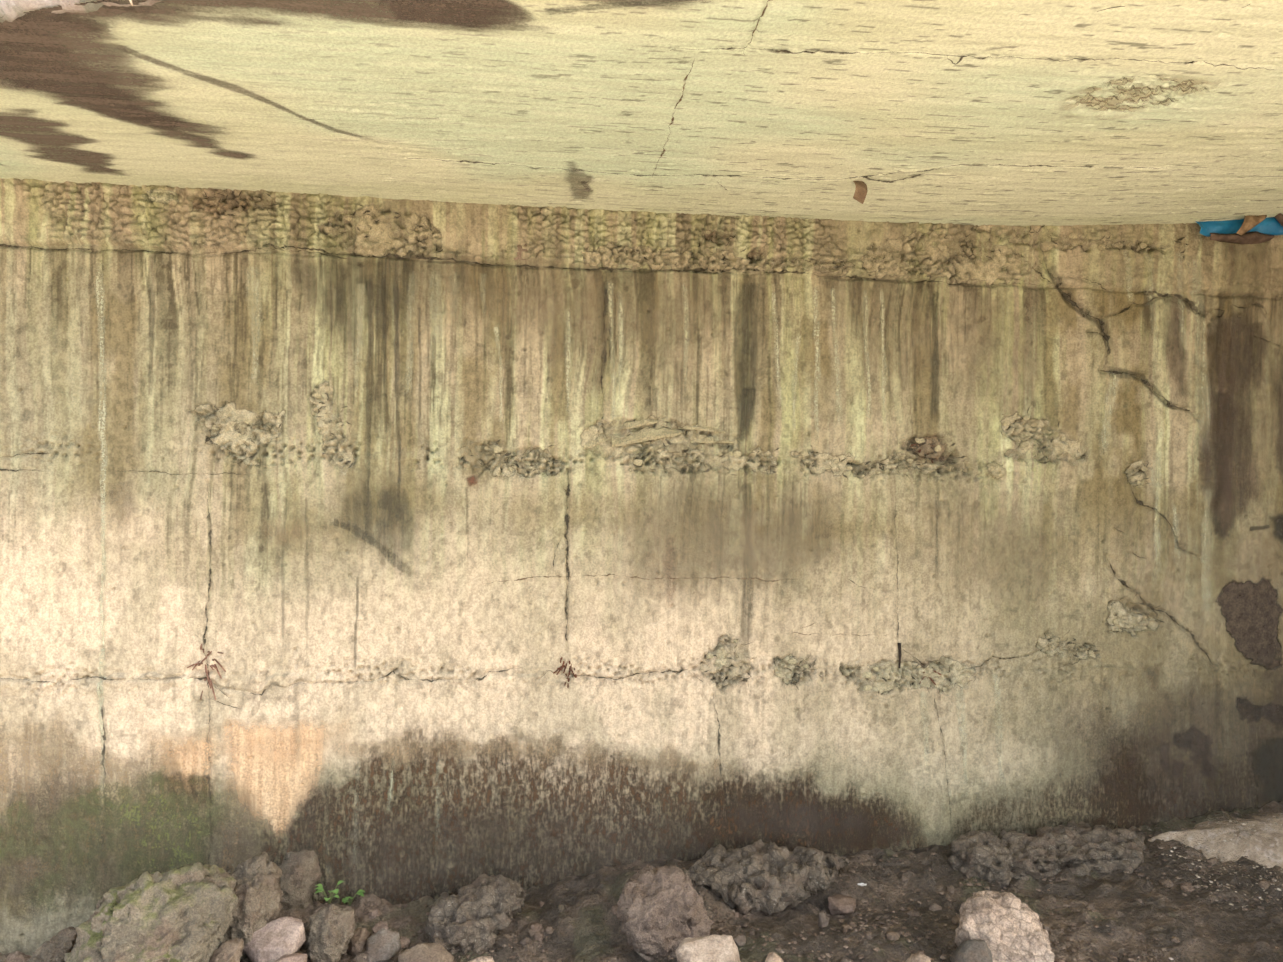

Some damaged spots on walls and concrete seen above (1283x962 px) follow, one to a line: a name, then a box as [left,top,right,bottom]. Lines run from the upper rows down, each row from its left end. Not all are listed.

damp [0,0,528,159]
damp [0,110,120,174]
damp [308,257,413,445]
peeling [461,440,553,477]
spalling [581,416,742,472]
spalling [800,433,966,479]
damp [1201,314,1264,536]
crack [1126,465,1206,561]
crack [1107,529,1212,664]
peeling [1216,578,1283,670]
spalling [839,656,978,694]
damp [263,731,923,905]